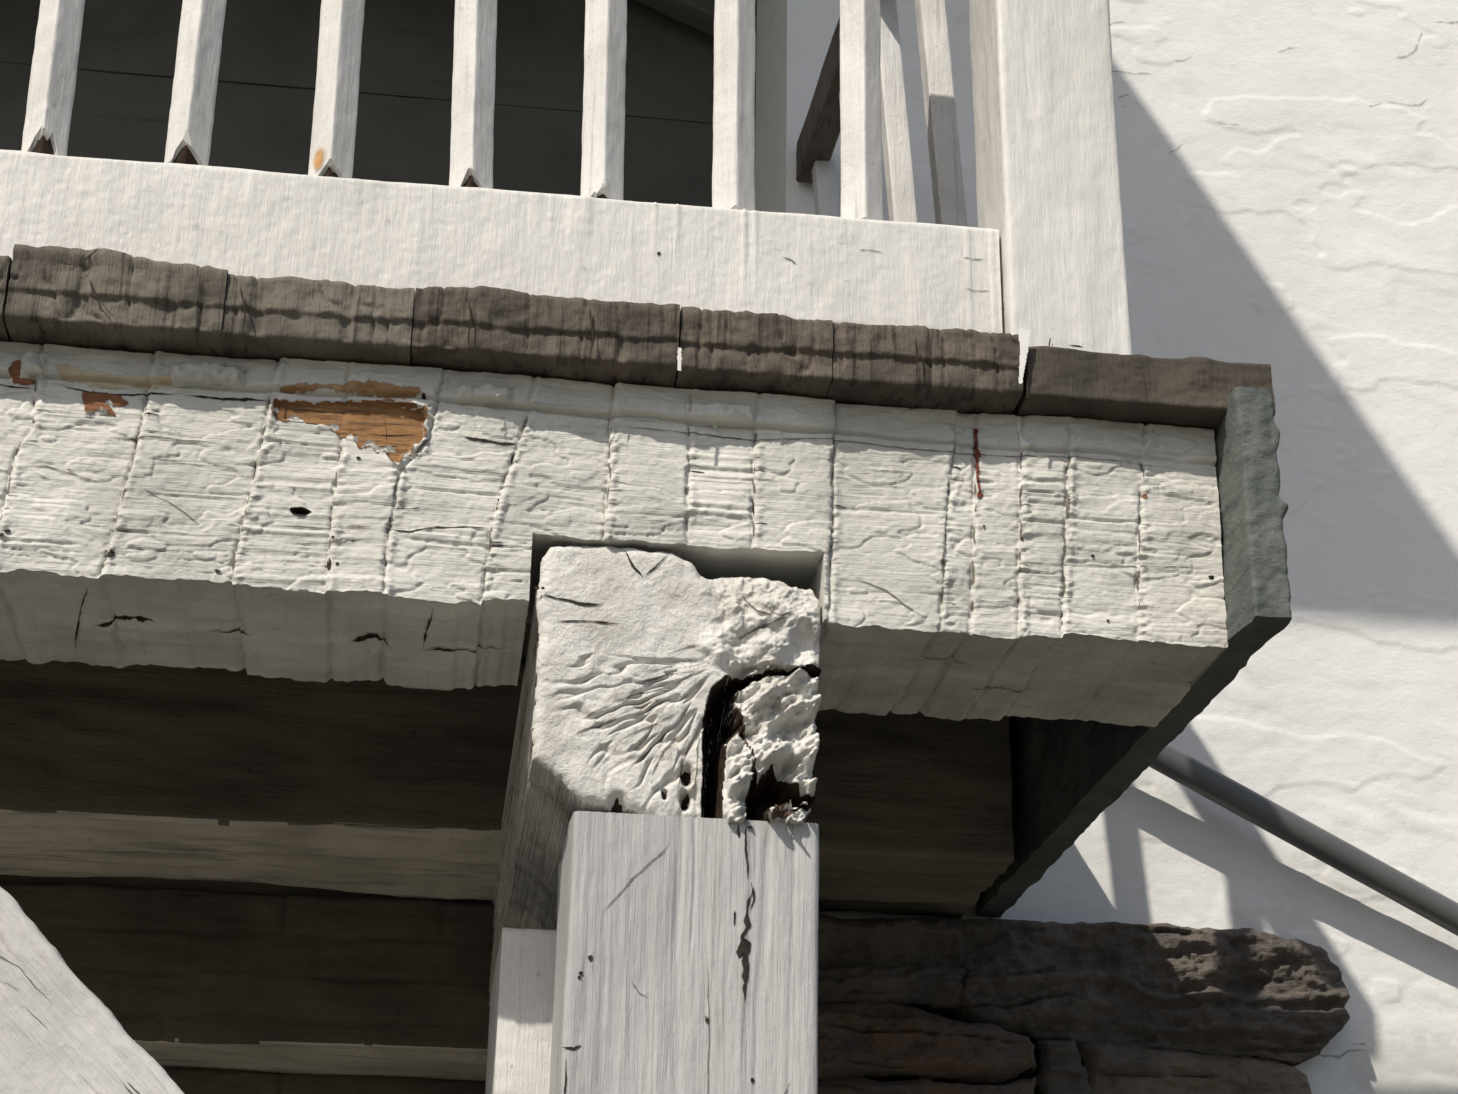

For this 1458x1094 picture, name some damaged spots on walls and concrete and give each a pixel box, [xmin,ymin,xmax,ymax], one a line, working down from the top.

peeling [82,391,128,418]
peeling [265,393,430,470]
corrosion [973,429,983,498]
crack [0,381,531,653]
crack [738,597,800,639]
crack [575,644,700,793]
spalling [745,764,817,821]
crack [0,956,51,1028]
crack [705,825,755,1094]